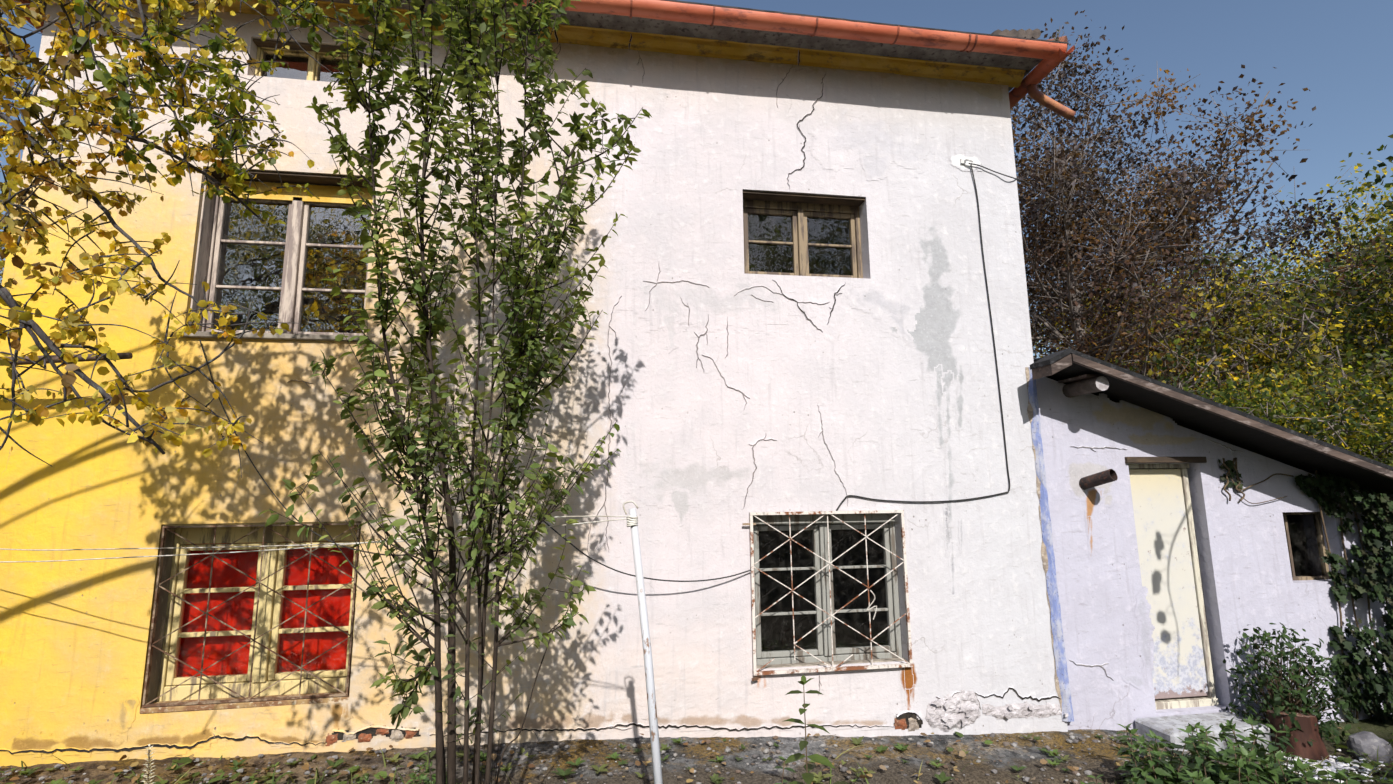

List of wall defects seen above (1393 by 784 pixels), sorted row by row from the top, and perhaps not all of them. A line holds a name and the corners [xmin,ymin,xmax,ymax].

crack [776,50,826,189]
crack [587,264,848,563]
damp [847,214,969,596]
peeling [1025,367,1033,423]
peeling [1032,444,1048,575]
rust [1084,488,1105,559]
crack [0,732,325,755]
spalling [325,725,421,746]
rust [899,662,918,711]
spalling [894,592,1068,732]